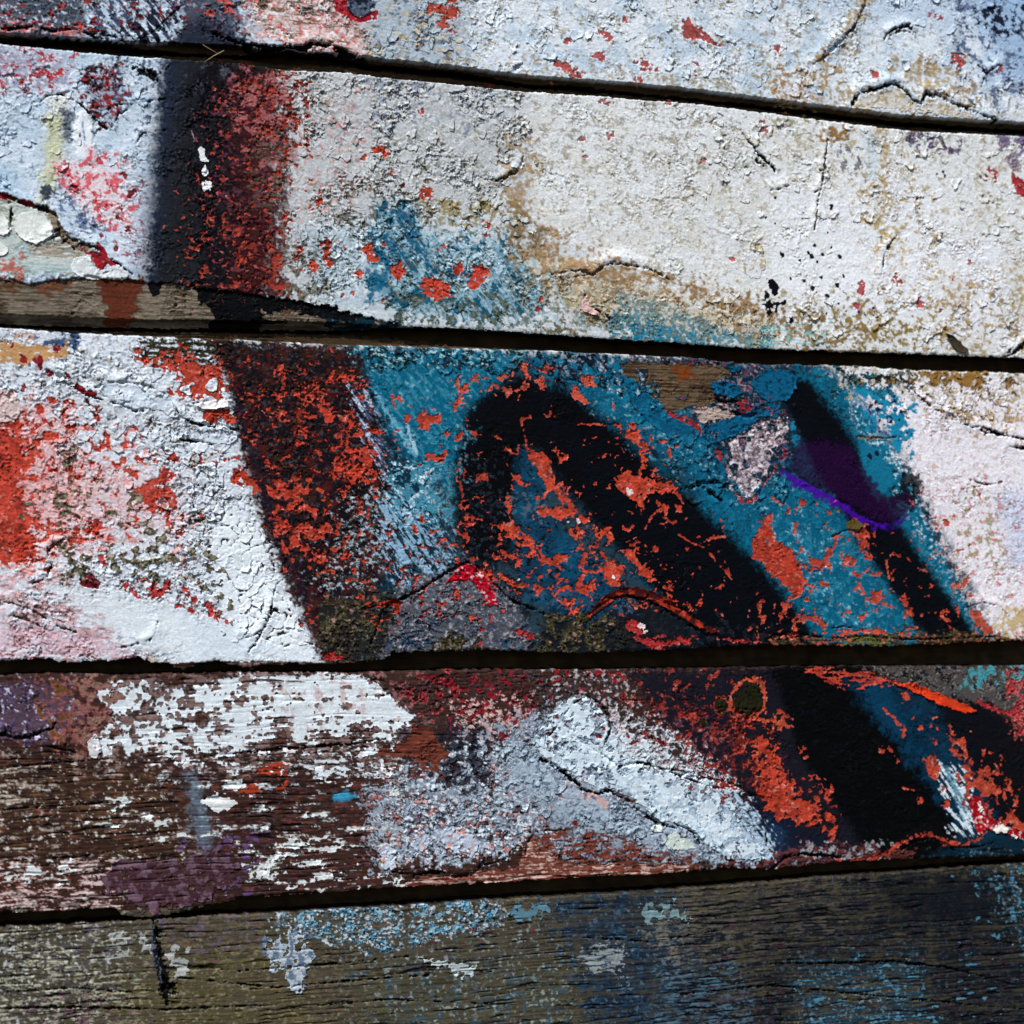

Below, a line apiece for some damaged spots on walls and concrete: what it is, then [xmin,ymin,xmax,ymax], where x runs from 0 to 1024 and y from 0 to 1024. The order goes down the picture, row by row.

crack [821,0,866,63]
crack [884,23,915,41]
crack [844,65,1001,126]
peeling [0,173,55,256]
spalling [106,150,137,232]
spalling [162,54,538,315]
peeling [71,234,128,280]
crack [551,263,668,321]
peeling [78,651,841,917]
crack [539,696,842,868]
peeling [0,858,77,886]
crack [900,838,992,851]